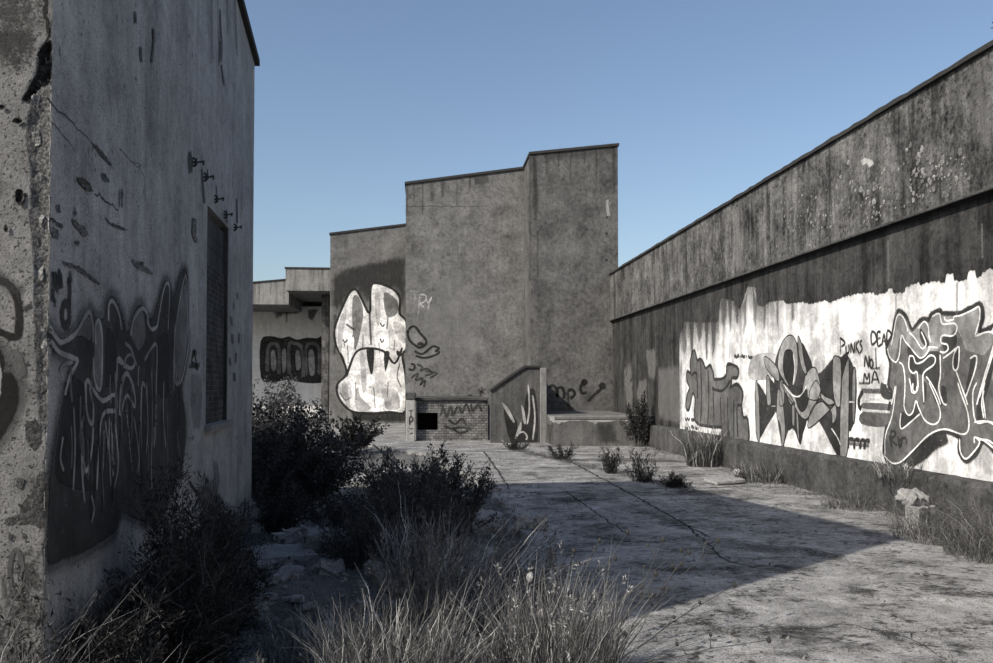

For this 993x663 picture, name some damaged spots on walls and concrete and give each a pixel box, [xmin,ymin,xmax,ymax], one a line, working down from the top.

water stain [0,0,40,71]
crack [47,97,93,151]
spalling [78,177,93,192]
spalling [11,40,89,451]
peeling [3,465,48,541]
crack [798,624,956,663]